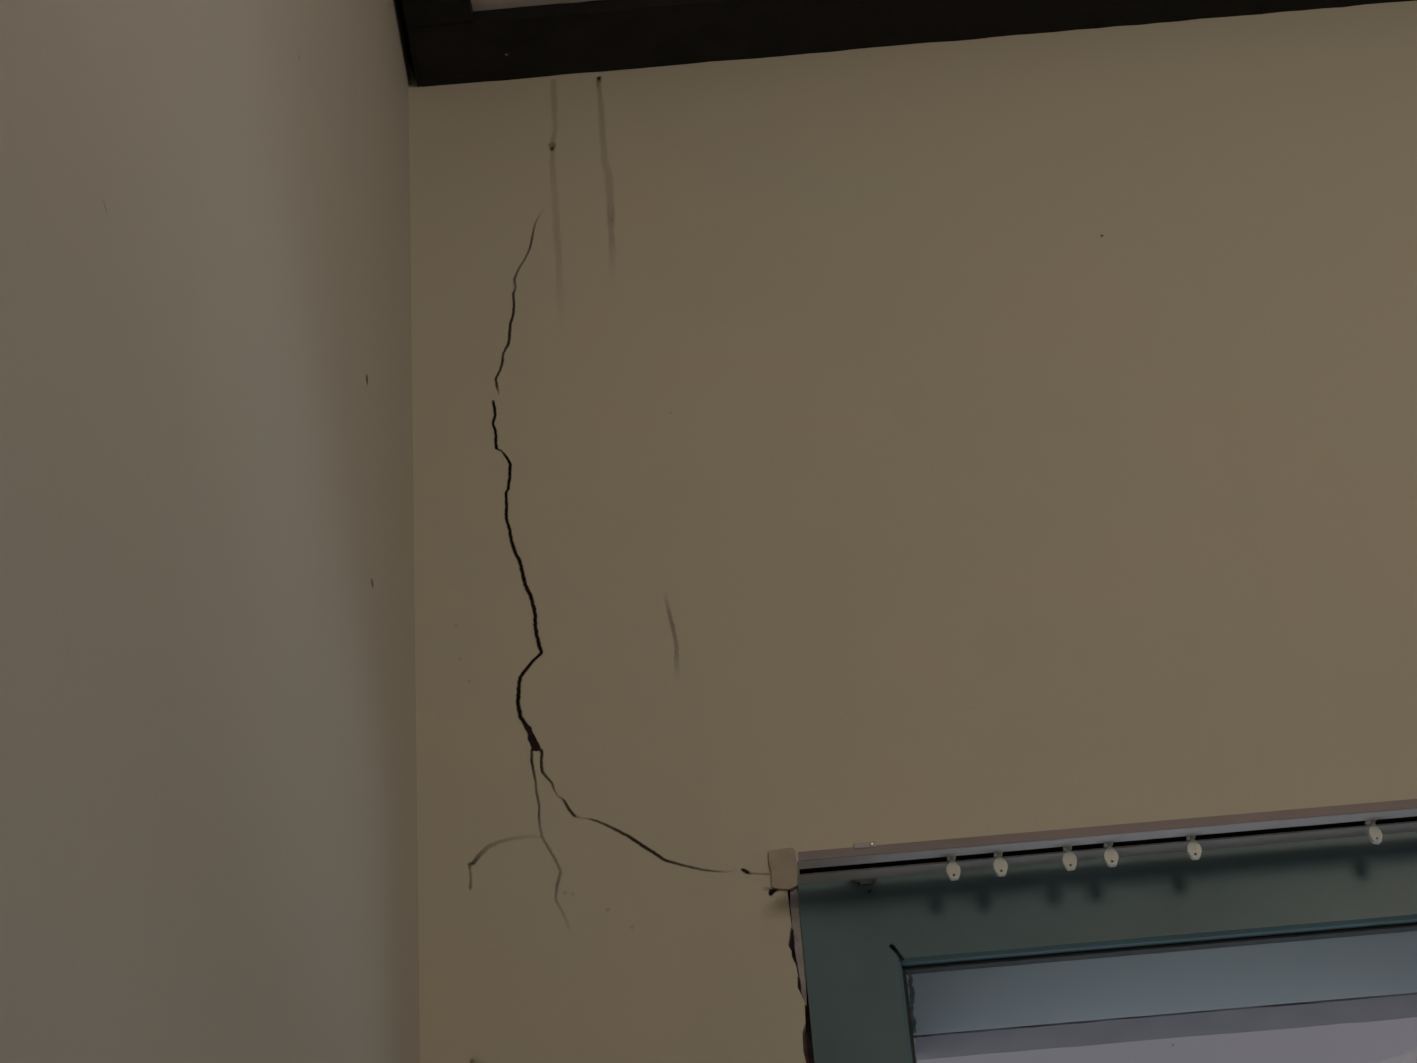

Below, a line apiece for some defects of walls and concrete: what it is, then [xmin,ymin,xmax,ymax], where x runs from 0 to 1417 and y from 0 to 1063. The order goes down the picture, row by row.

crack [492,235,701,870]